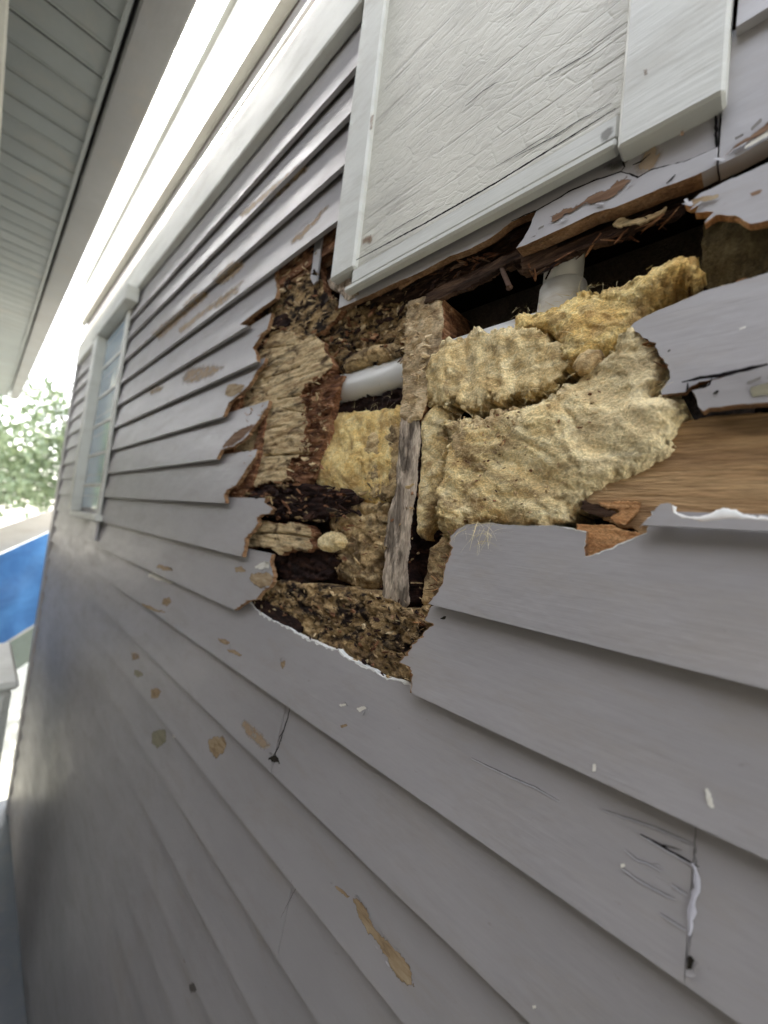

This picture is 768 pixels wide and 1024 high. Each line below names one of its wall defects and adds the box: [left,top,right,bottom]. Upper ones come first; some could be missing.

peeling [533,176,632,237]
peeling [221,424,253,448]
peeling [672,505,768,521]
peeling [235,560,273,588]
peeling [208,736,226,759]
crack [602,809,699,957]
peeling [330,882,414,987]